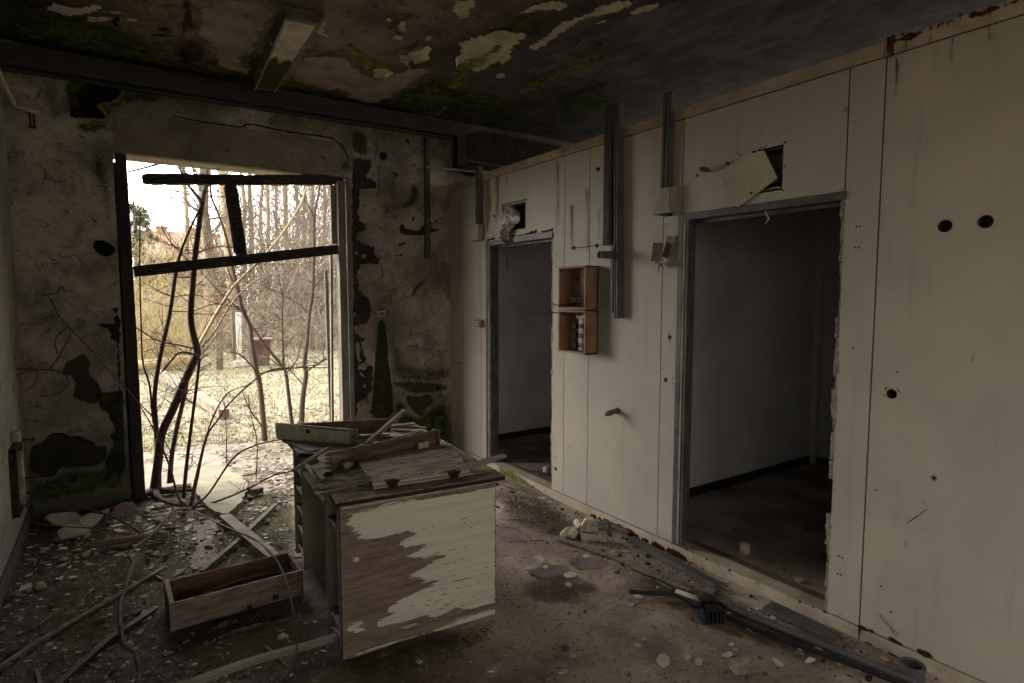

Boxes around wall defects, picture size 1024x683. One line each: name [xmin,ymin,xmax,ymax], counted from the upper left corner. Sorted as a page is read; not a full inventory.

peeling [47,3,137,23]
flaking render [70,83,121,119]
peeling [196,0,276,76]
peeling [292,35,432,103]
peeling [456,0,659,78]
corrosion [886,0,1018,83]
crack [172,115,379,196]
flaking render [395,217,440,257]
peeling [351,157,380,416]
flaking render [29,354,120,478]
corrosion [590,514,708,570]
corrosion [857,625,903,658]